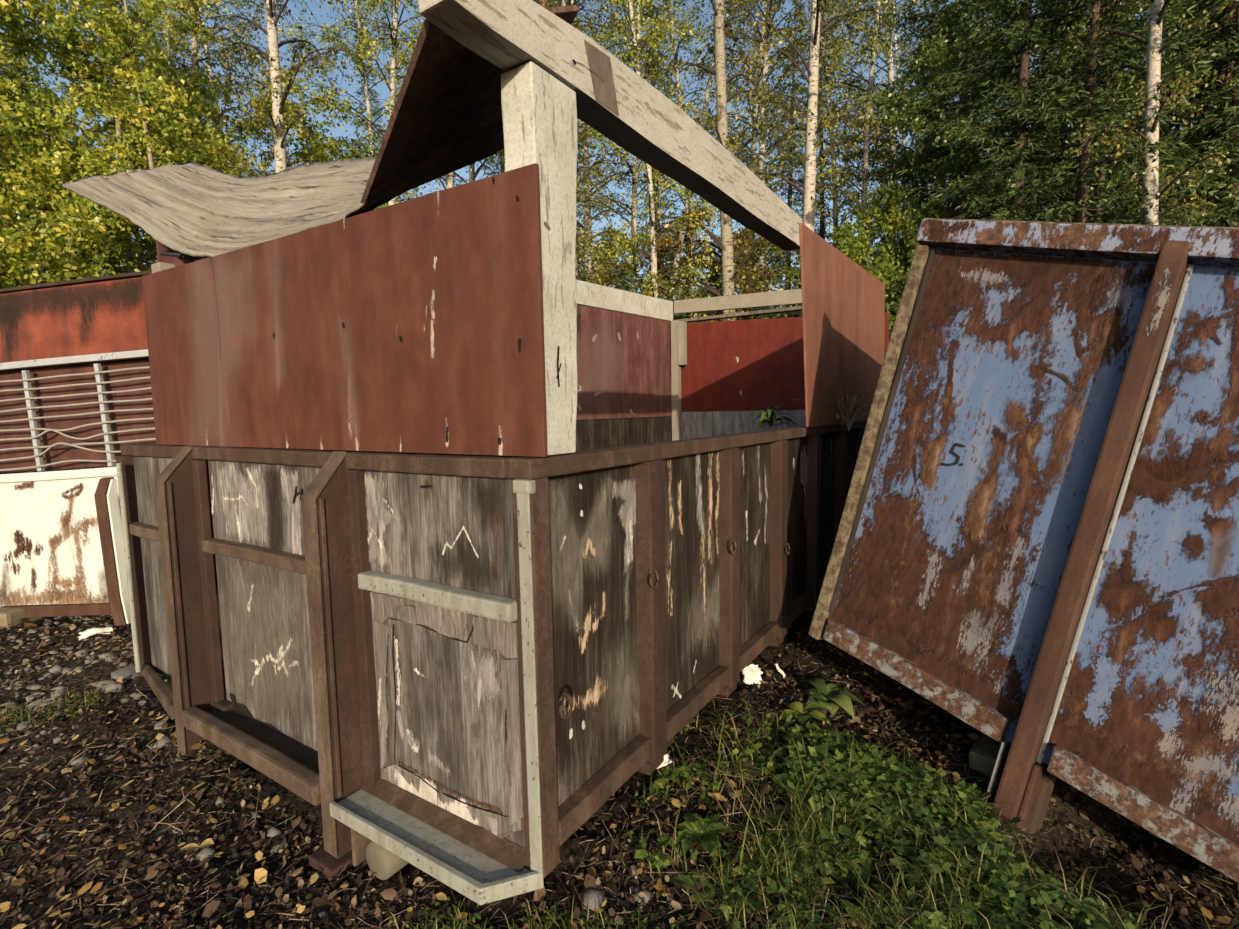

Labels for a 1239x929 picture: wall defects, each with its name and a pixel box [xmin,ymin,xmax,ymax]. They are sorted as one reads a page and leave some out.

rust [1229,230,1239,256]
damp [0,280,140,358]
rust [829,220,1181,733]
rust [1,483,109,606]
damp [548,477,612,629]
peeling [910,534,1061,698]
rust [1043,270,1239,844]
damp [557,771,573,807]
damp [605,645,640,737]
peeling [1083,654,1121,730]
peeling [1145,659,1239,837]